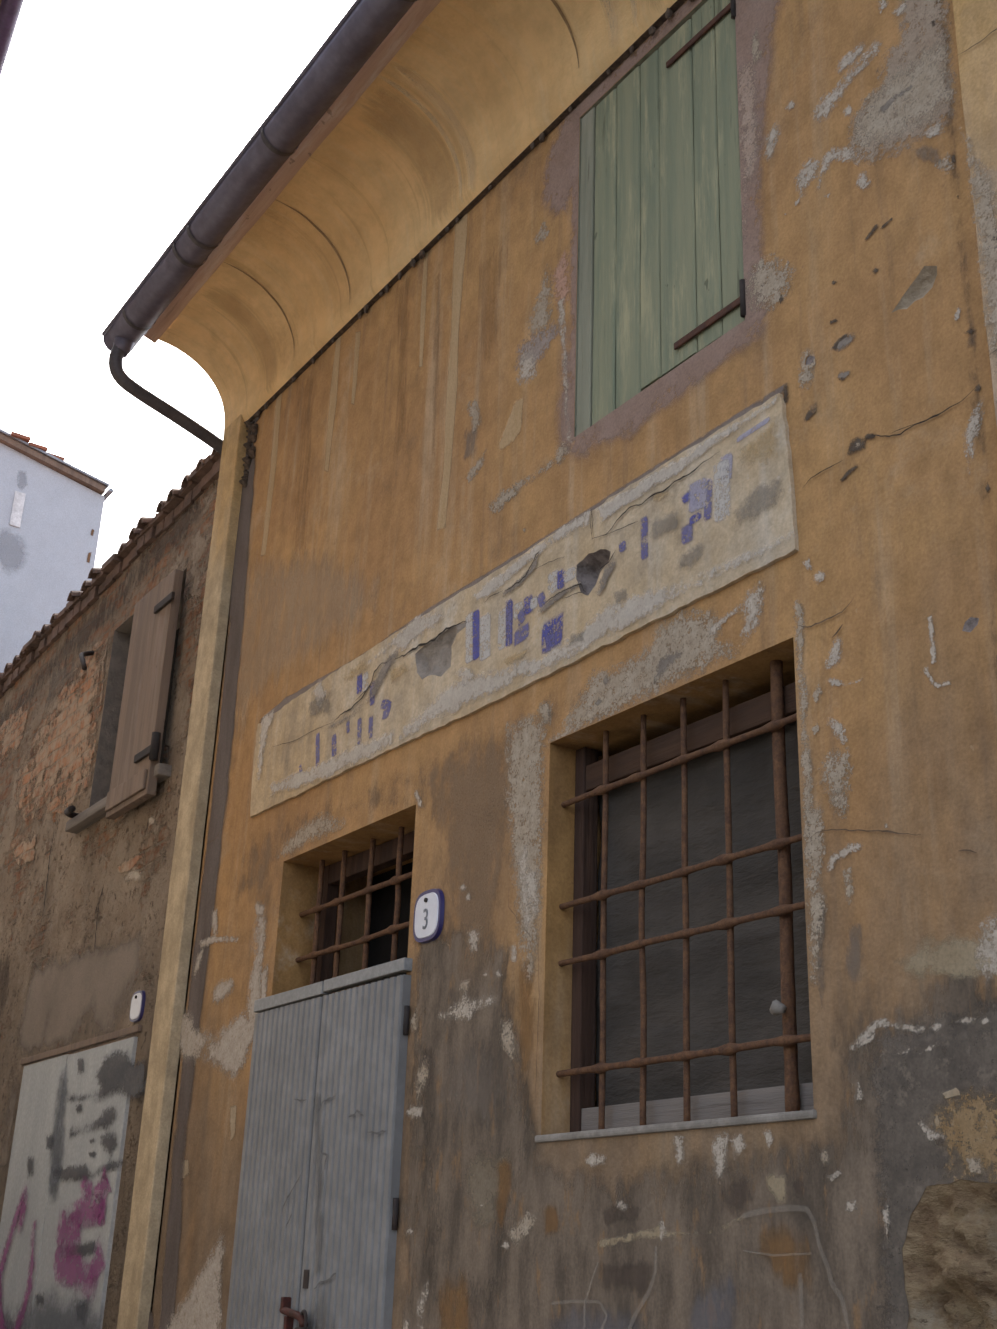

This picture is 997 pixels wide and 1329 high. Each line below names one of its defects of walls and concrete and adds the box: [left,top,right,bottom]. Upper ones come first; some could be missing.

peeling [785,0,956,215]
spalling [358,249,425,319]
flaking render [489,0,795,513]
spalling [239,395,276,488]
peeling [474,351,815,599]
crack [802,389,974,489]
crack [273,451,720,747]
flaking render [0,637,108,865]
peeling [258,537,784,981]
peeling [179,902,268,1078]
peeling [439,980,494,1021]
leakage [402,930,997,1329]